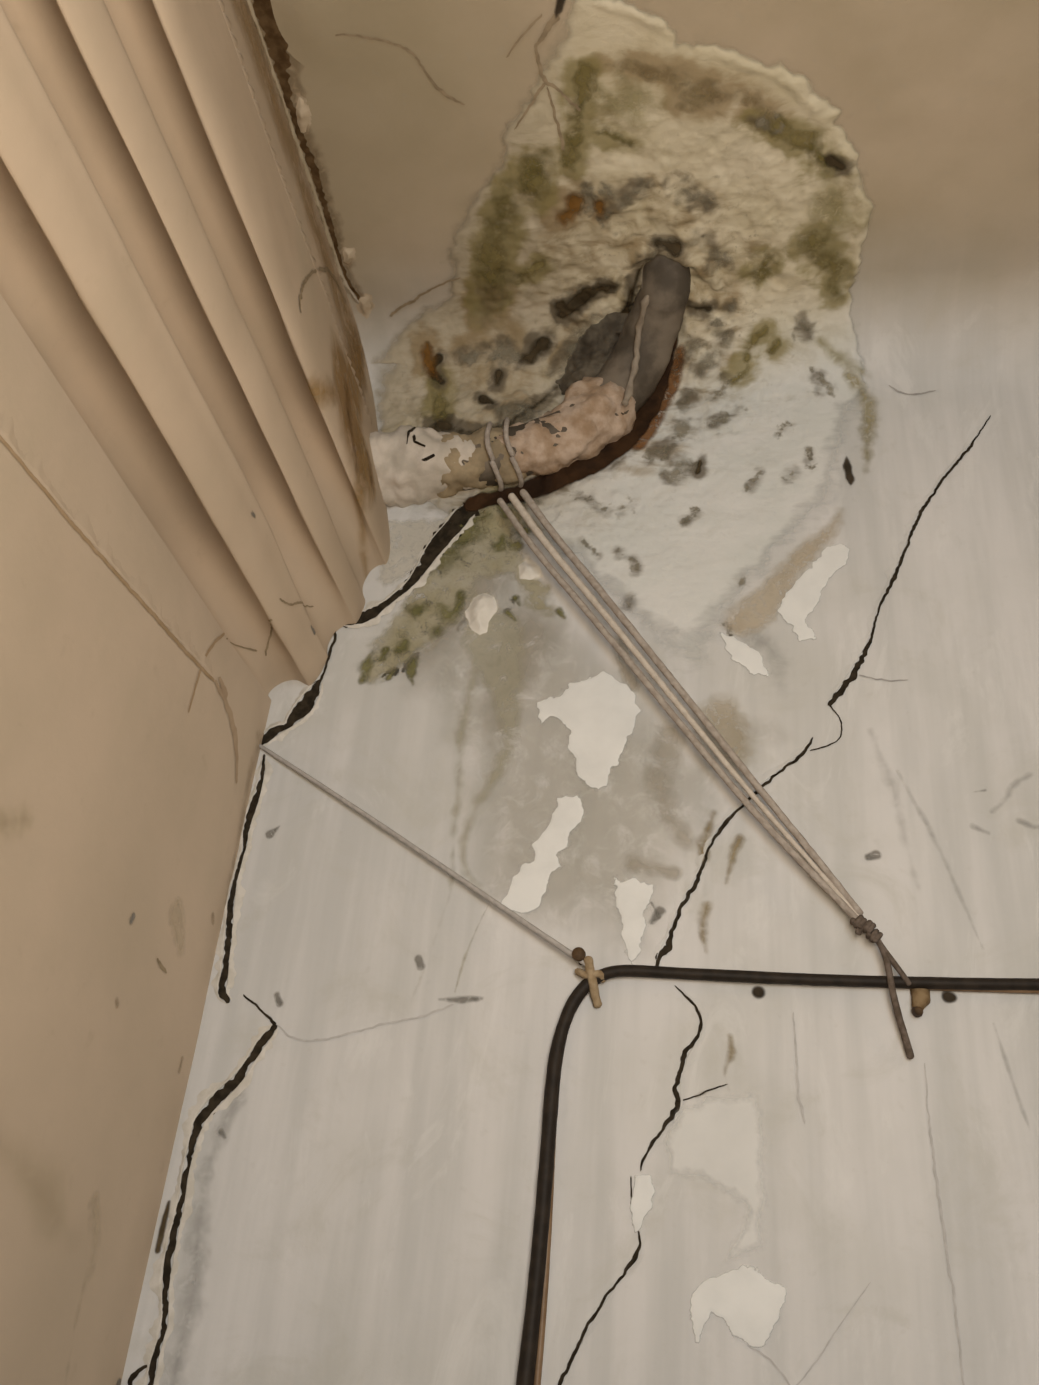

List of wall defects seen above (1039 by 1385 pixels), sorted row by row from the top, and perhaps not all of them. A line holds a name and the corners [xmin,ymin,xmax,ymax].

water stain [239,0,358,355]
crack [247,0,465,317]
flaking render [375,0,874,676]
water stain [359,491,565,727]
water stain [728,532,828,632]
crack [127,502,480,1385]
peeling [501,671,641,913]
peeling [614,877,653,965]
water stain [730,836,742,862]
crack [558,415,991,1385]
peeling [630,1175,655,1232]
peeling [668,1099,786,1347]